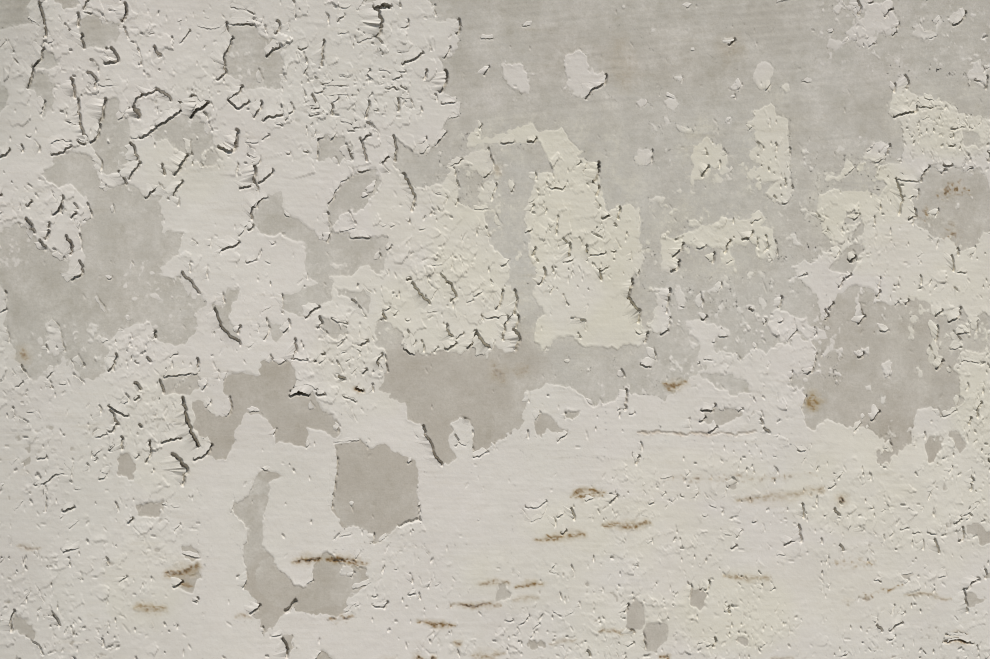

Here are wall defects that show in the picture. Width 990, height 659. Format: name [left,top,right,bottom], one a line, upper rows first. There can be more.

peeling [0,0,702,558]
peeling [806,74,990,659]
crack [182,397,203,449]
peeling [230,210,968,659]
rust [569,483,610,503]
rust [531,526,590,548]
rust [600,516,656,535]
rust [289,549,374,574]
rust [473,575,549,592]